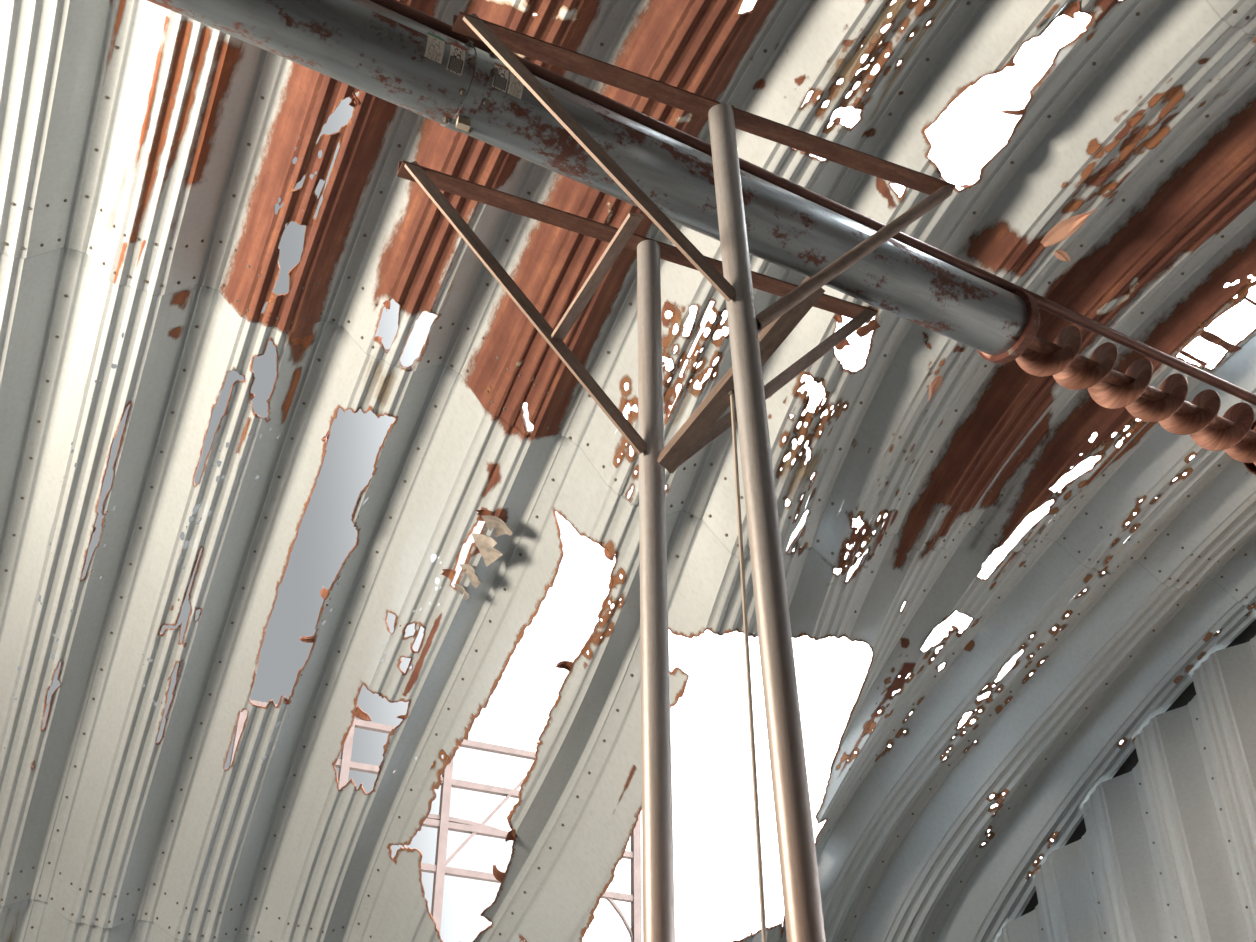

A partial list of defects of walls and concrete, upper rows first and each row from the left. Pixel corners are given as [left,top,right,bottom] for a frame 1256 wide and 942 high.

corrosion [614,0,777,101]
peeling [1060,0,1080,19]
corrosion [113,16,243,284]
corrosion [220,62,397,424]
corrosion [965,85,1256,375]
corrosion [464,221,637,441]
corrosion [838,360,1157,589]
peeling [441,569,456,581]
peeling [354,706,372,721]
peeling [555,661,573,672]
peeling [493,864,505,883]
peeling [505,817,516,842]